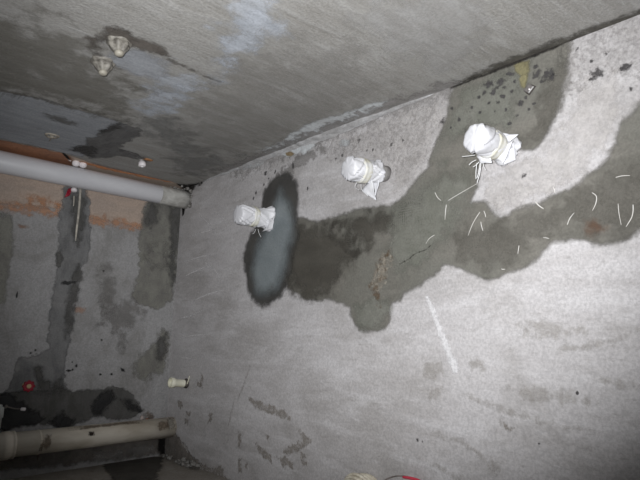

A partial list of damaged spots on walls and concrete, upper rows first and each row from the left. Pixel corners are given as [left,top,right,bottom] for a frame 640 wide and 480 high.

corrosion [0,173,66,217]
leakage [0,186,142,432]
corrosion [0,140,183,189]
leakage [0,22,226,176]
corrosion [85,190,147,230]
leakage [99,202,181,348]
leakage [133,330,169,380]
leakage [244,42,640,331]